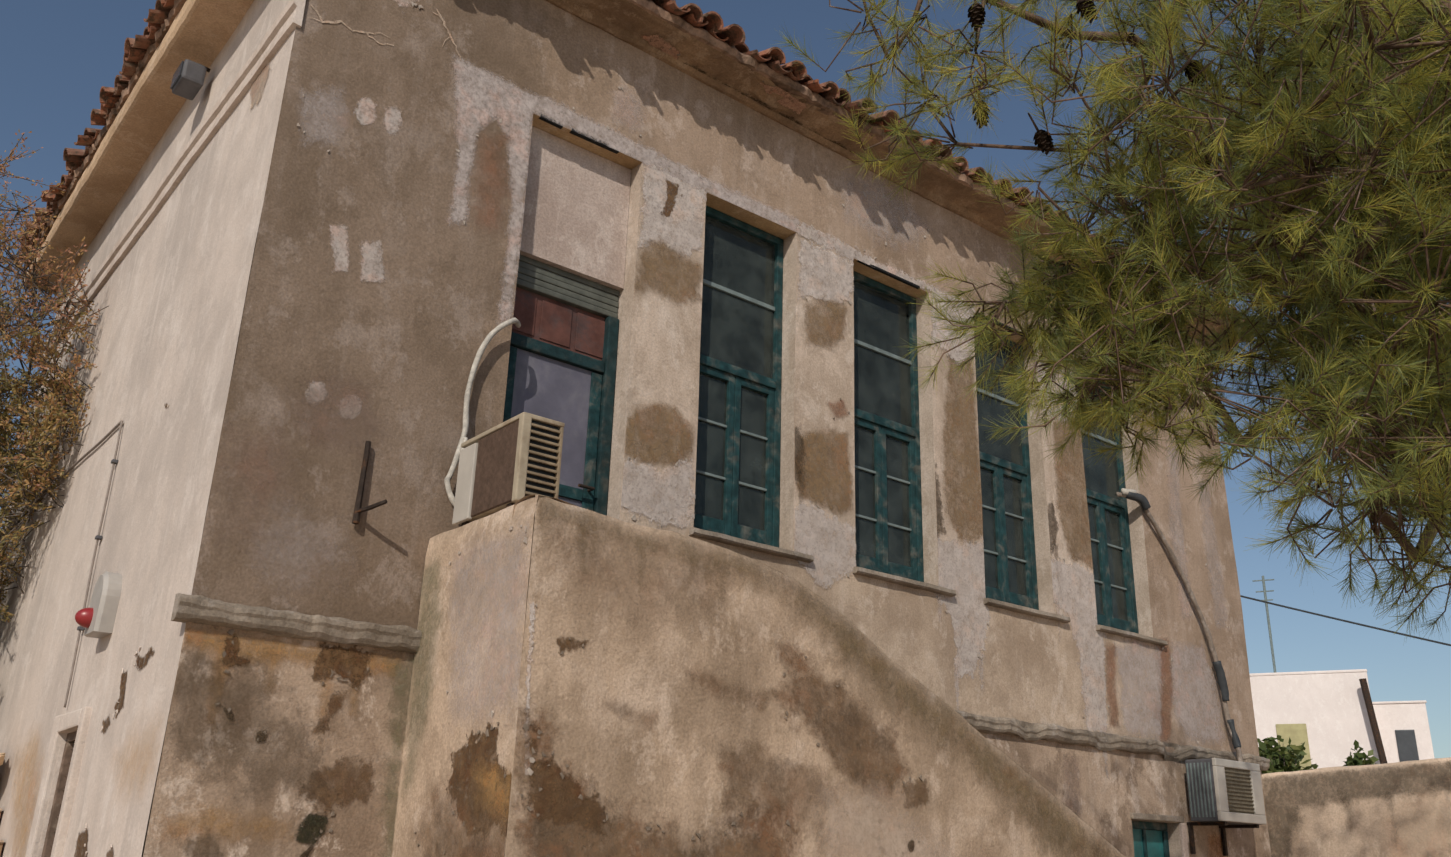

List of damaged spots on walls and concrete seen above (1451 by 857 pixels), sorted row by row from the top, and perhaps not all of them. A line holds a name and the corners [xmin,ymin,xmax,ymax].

flaking render [101,646,154,734]
flaking render [311,641,373,691]
flaking render [446,602,608,840]
water stain [771,645,909,796]
water stain [803,593,1110,857]
water stain [1161,646,1172,740]
flaking render [74,824,88,857]
crack [300,845,314,857]